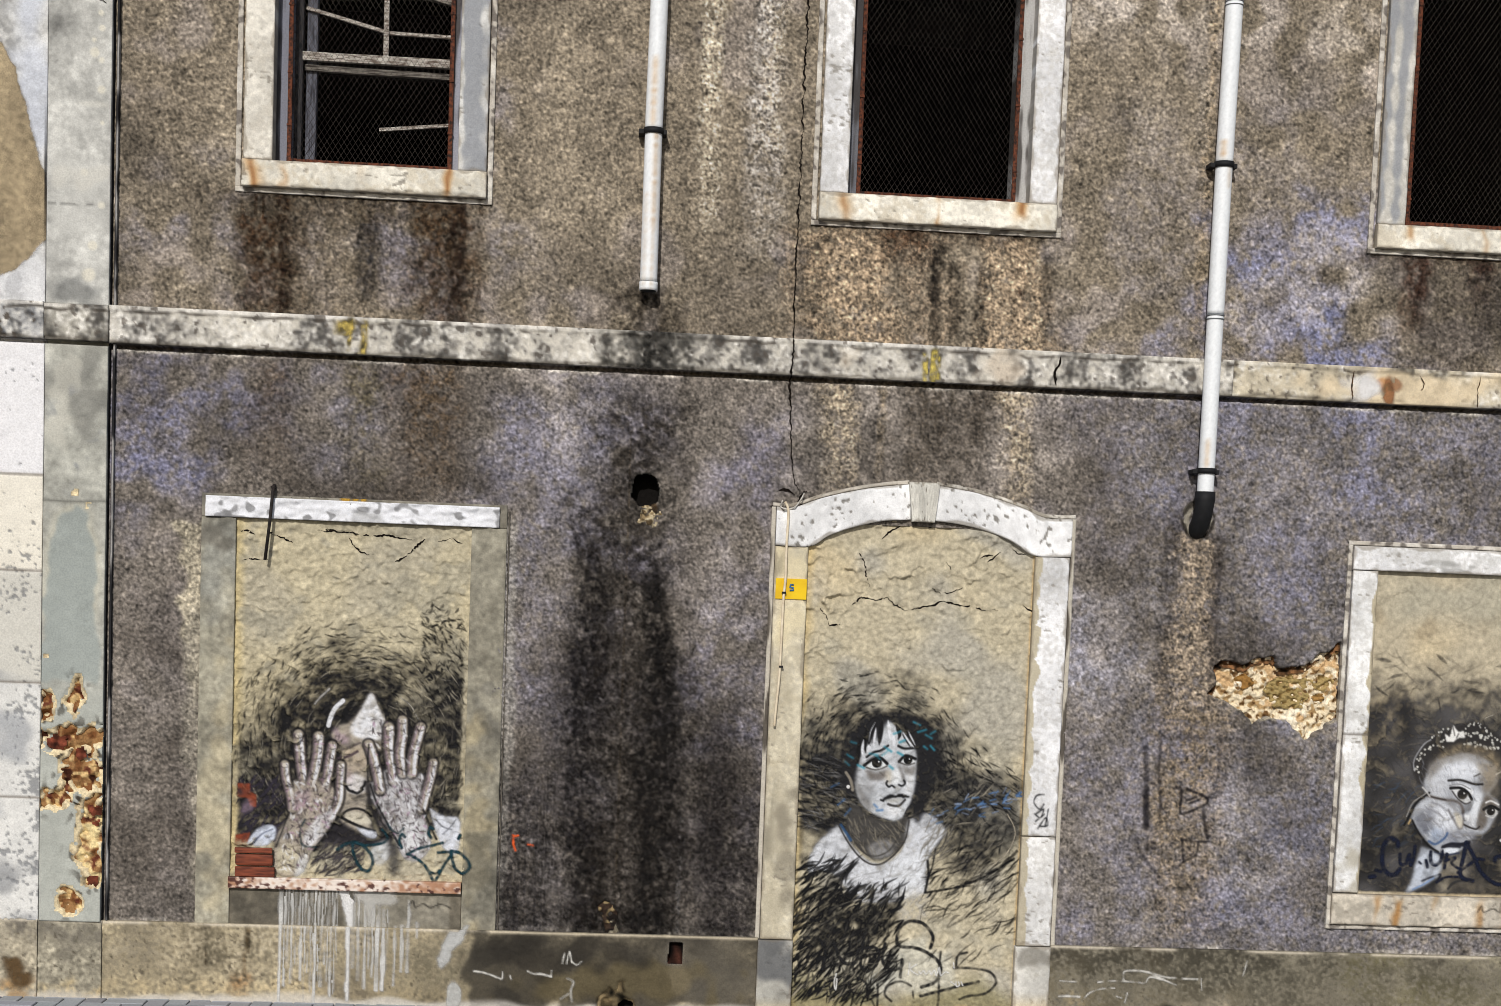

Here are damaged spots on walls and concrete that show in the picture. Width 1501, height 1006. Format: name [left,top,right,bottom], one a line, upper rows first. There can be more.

peeling [0,41,47,275]
leakage [359,223,380,288]
leakage [602,292,689,369]
crack [770,0,810,507]
corrosion [1407,258,1431,298]
hole [620,474,662,544]
leakage [496,405,694,934]
spalling [1207,643,1340,740]
spalling [40,673,104,917]
leakage [703,801,758,937]